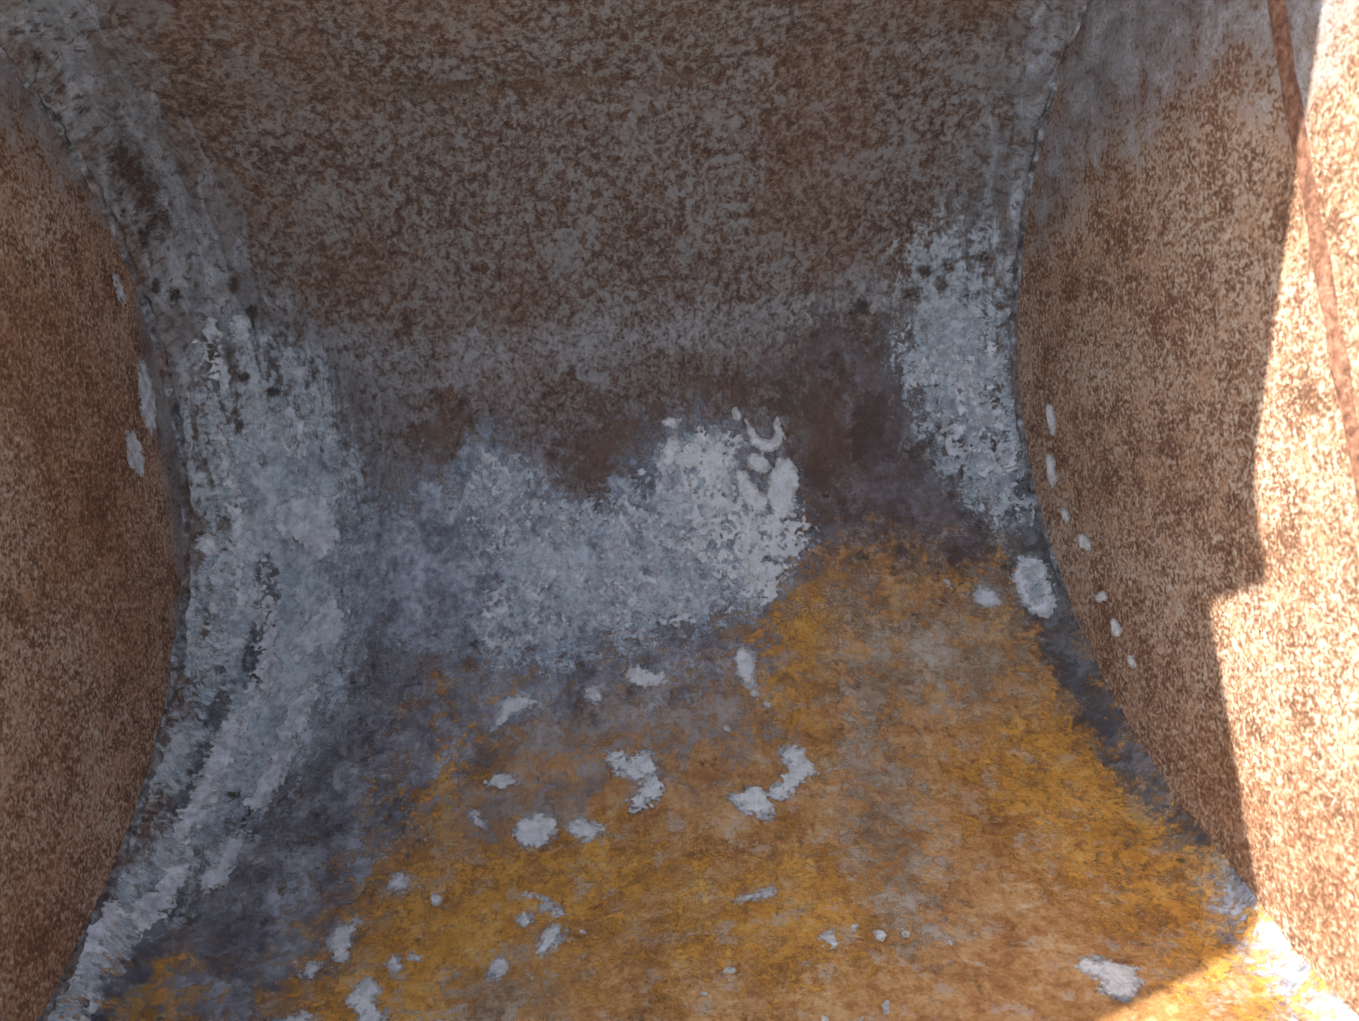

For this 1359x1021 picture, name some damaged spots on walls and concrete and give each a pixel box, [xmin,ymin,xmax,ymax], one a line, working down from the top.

corrosion [402,61,733,103]
leakage [162,551,281,825]
leakage [310,680,384,800]
corrosion [55,354,1337,1021]
leakage [764,285,1359,1021]
leakage [84,886,185,1021]